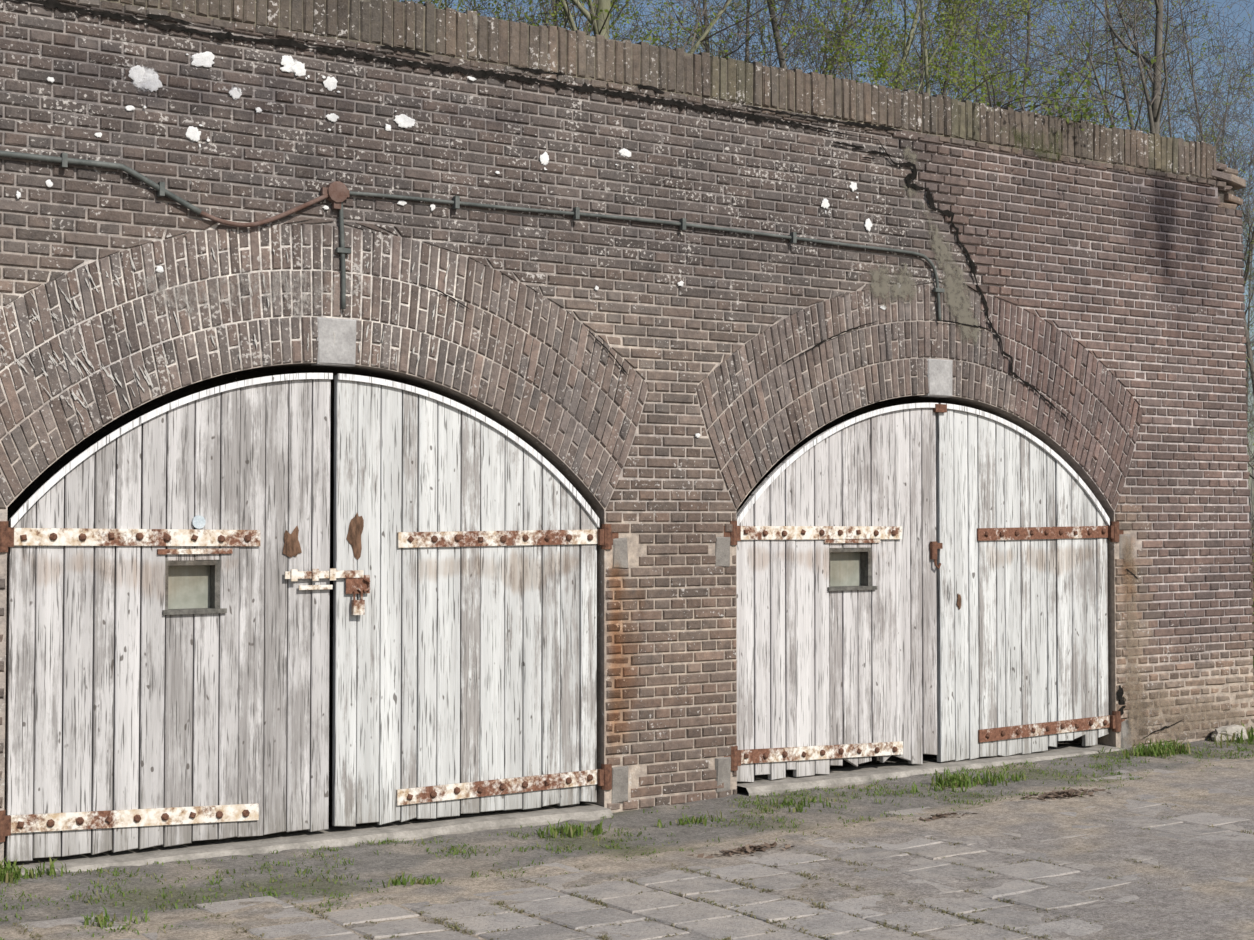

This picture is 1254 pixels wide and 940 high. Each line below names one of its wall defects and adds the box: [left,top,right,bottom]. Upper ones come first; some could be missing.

crack [15,0,1083,435]